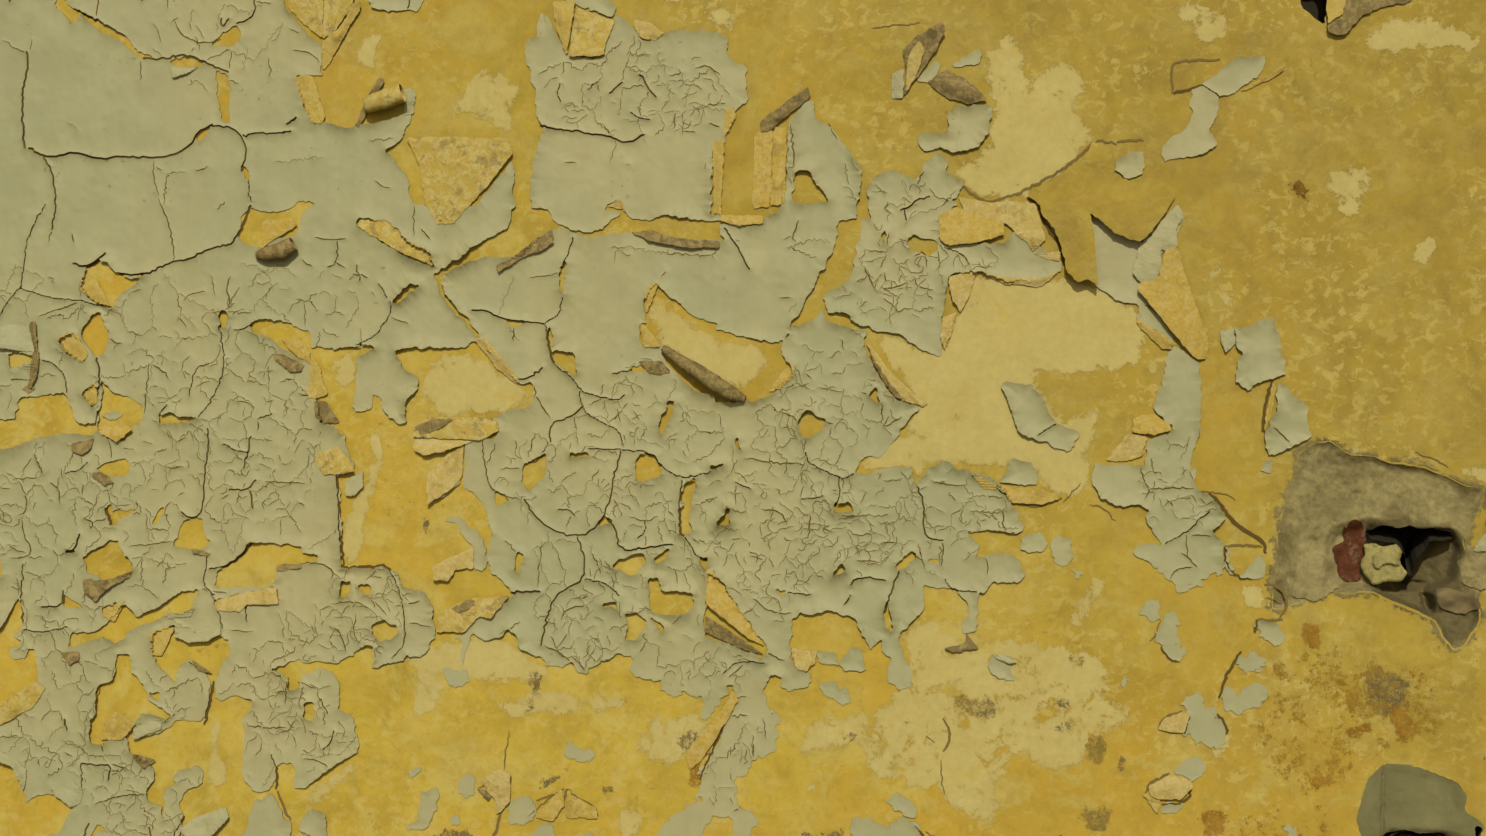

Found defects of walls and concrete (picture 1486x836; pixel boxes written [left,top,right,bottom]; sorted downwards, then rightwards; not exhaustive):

peeling [1326,0,1480,57]
crack [538,35,730,169]
peeling [1161,55,1285,162]
crack [0,0,430,836]
peeling [0,0,1147,836]
peeling [1020,142,1236,593]
spalling [1220,318,1486,653]
peeling [1139,599,1186,662]
crack [479,731,599,836]